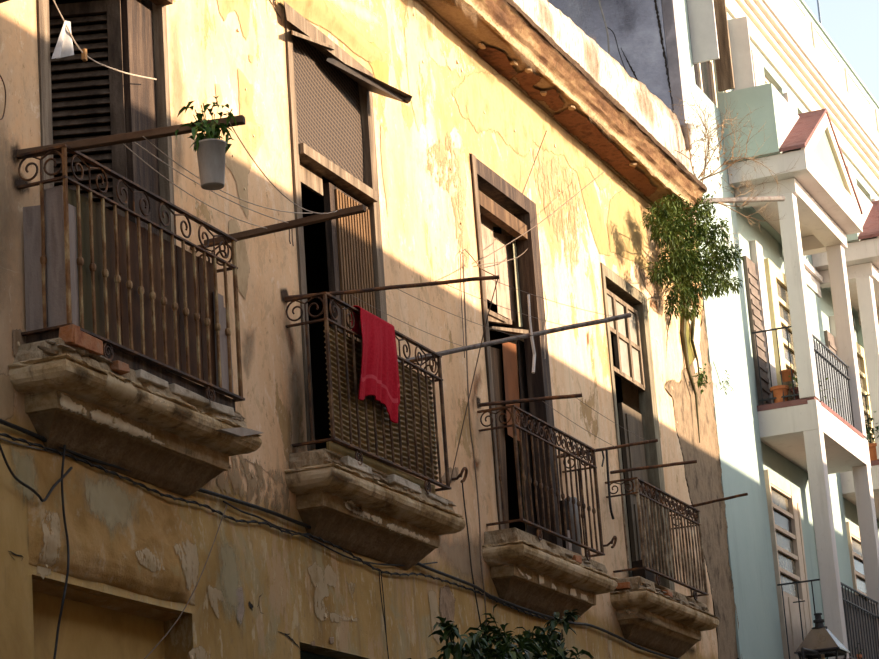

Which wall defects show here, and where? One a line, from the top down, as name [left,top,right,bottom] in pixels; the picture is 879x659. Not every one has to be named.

peeling [217,0,251,41]
flaking render [275,0,389,84]
peeling [222,69,264,300]
flaking render [216,454,290,514]
peeling [37,511,61,579]
peeling [174,539,199,591]
peeling [308,562,359,623]